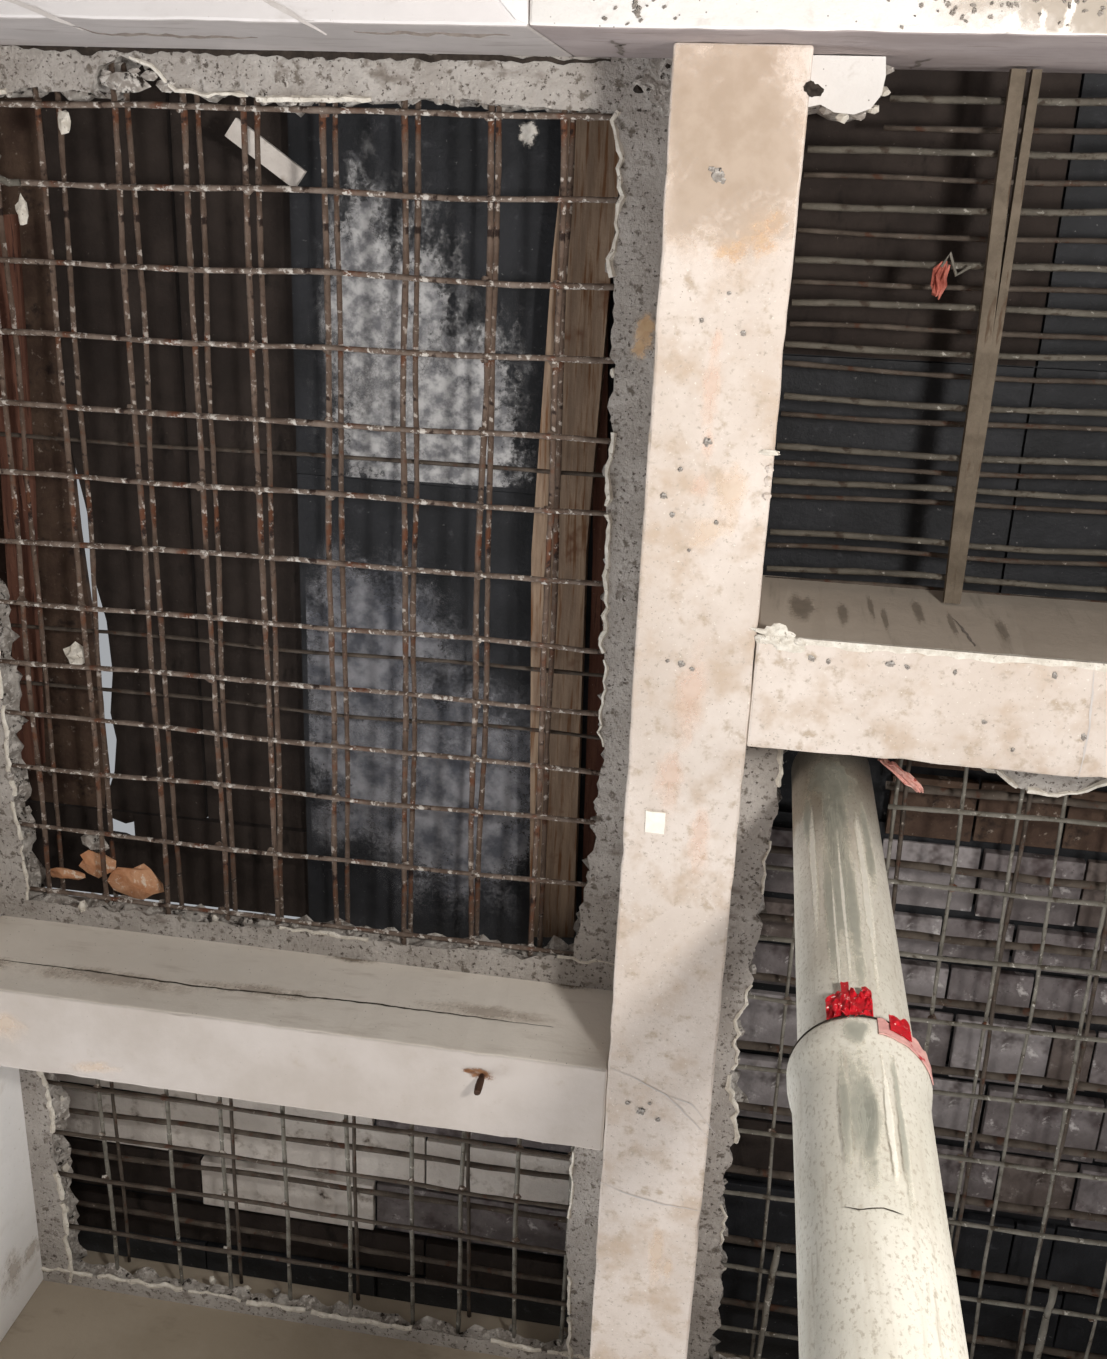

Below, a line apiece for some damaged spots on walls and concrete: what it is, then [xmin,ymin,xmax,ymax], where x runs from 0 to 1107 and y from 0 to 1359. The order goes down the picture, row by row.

spalling [803,55,1006,158]
spalling [802,202,991,215]
spalling [783,256,985,380]
spalling [1005,263,1107,318]
spalling [781,392,967,427]
spalling [758,443,960,506]
spalling [975,456,1107,515]
spalling [765,529,949,591]
spalling [962,543,1107,603]
spalling [687,743,799,1359]
spalling [884,759,1107,1359]
spalling [19,1069,603,1359]